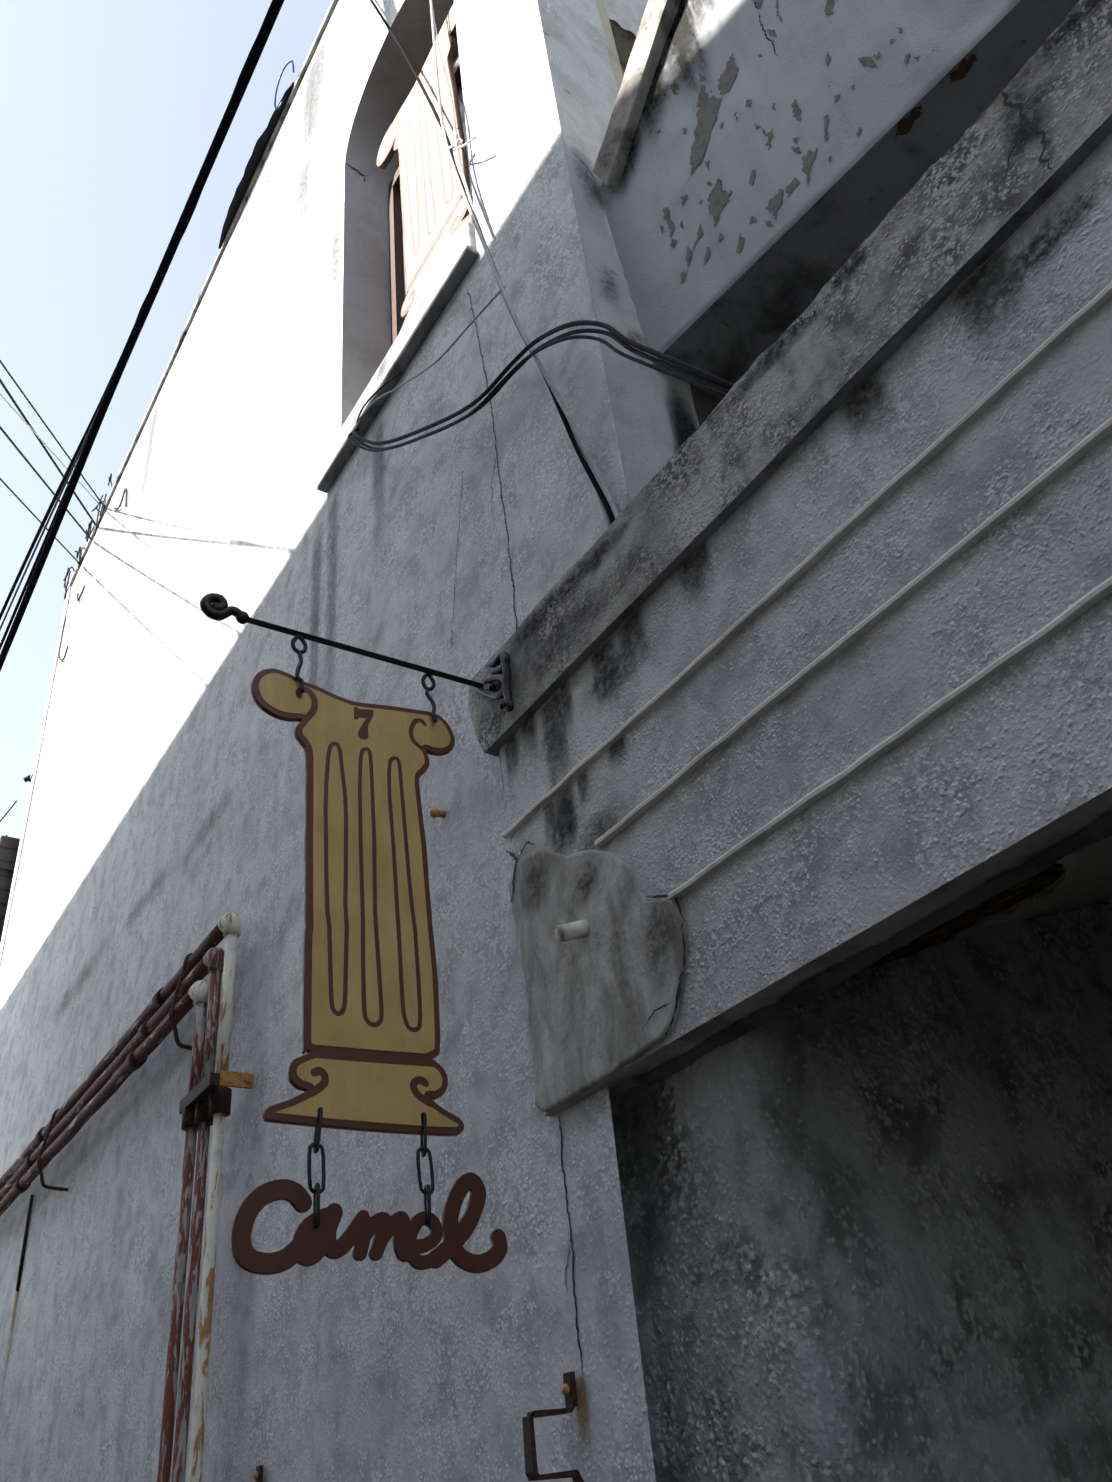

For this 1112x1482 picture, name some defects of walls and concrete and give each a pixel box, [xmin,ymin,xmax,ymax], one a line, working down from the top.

peeling [660,52,855,284]
peeling [824,0,834,15]
peeling [858,27,919,68]
spalling [895,105,924,139]
spalling [948,53,977,85]
leakage [955,196,1091,327]
leakage [515,539,610,663]
leakage [592,610,644,696]
leakage [505,683,571,773]
leakage [544,771,614,892]
flaking render [861,853,1082,970]
crack [558,1116,583,1373]